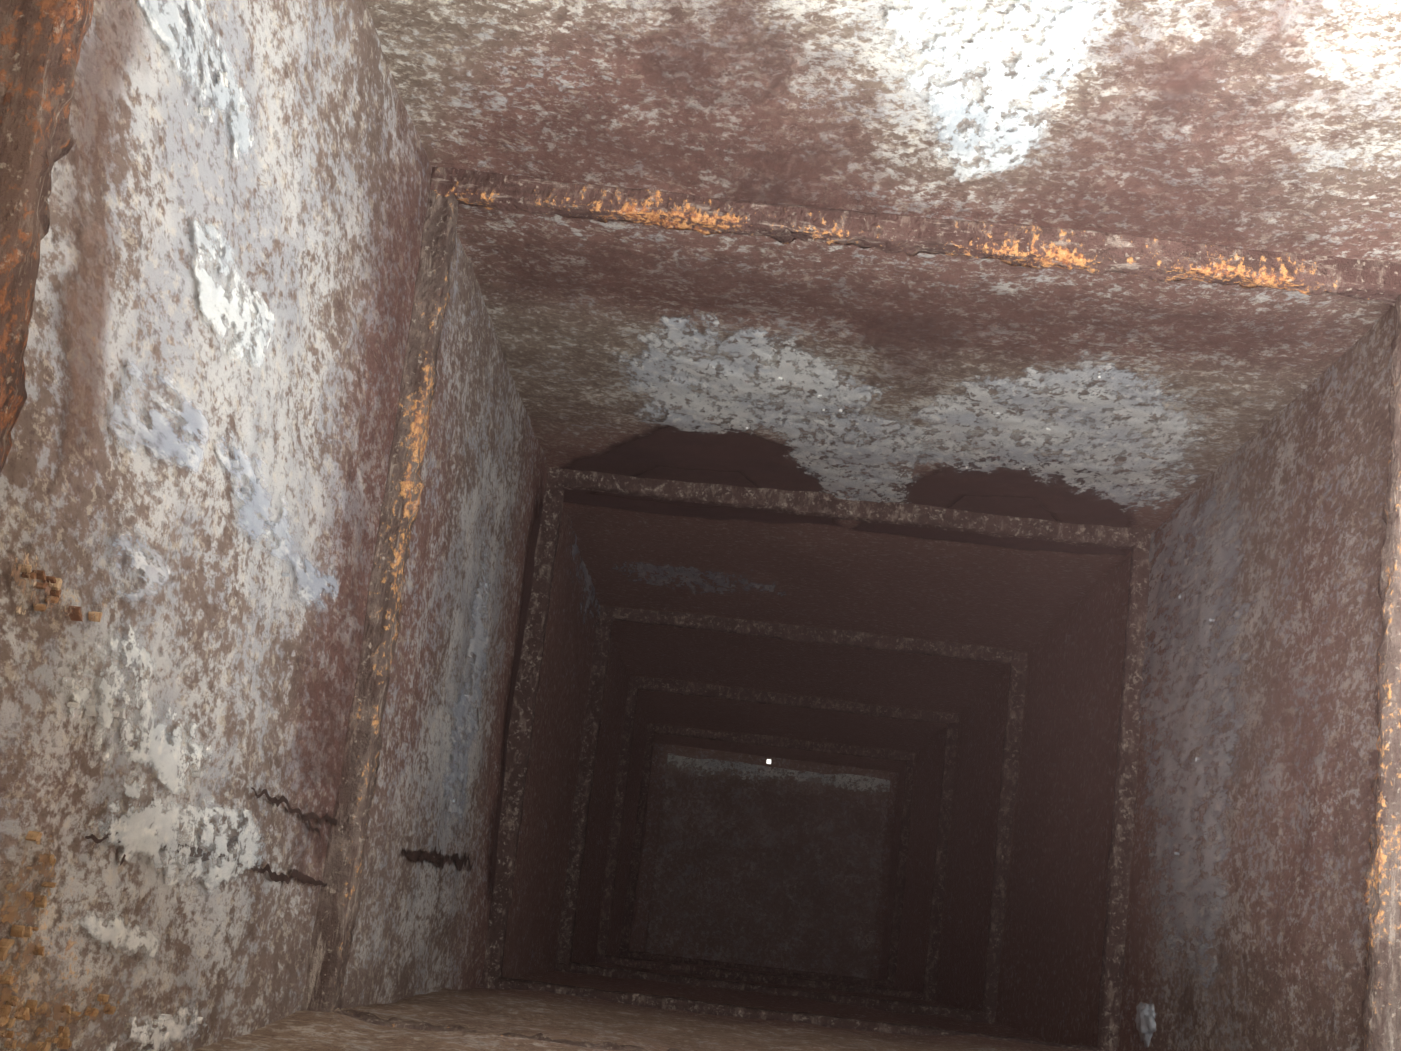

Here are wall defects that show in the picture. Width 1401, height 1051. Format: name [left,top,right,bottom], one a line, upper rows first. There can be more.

corrosion [73,0,133,180]
corrosion [64,206,110,451]
crack [251,787,369,839]
crack [85,832,126,866]
crack [160,836,327,887]
crack [402,846,476,872]